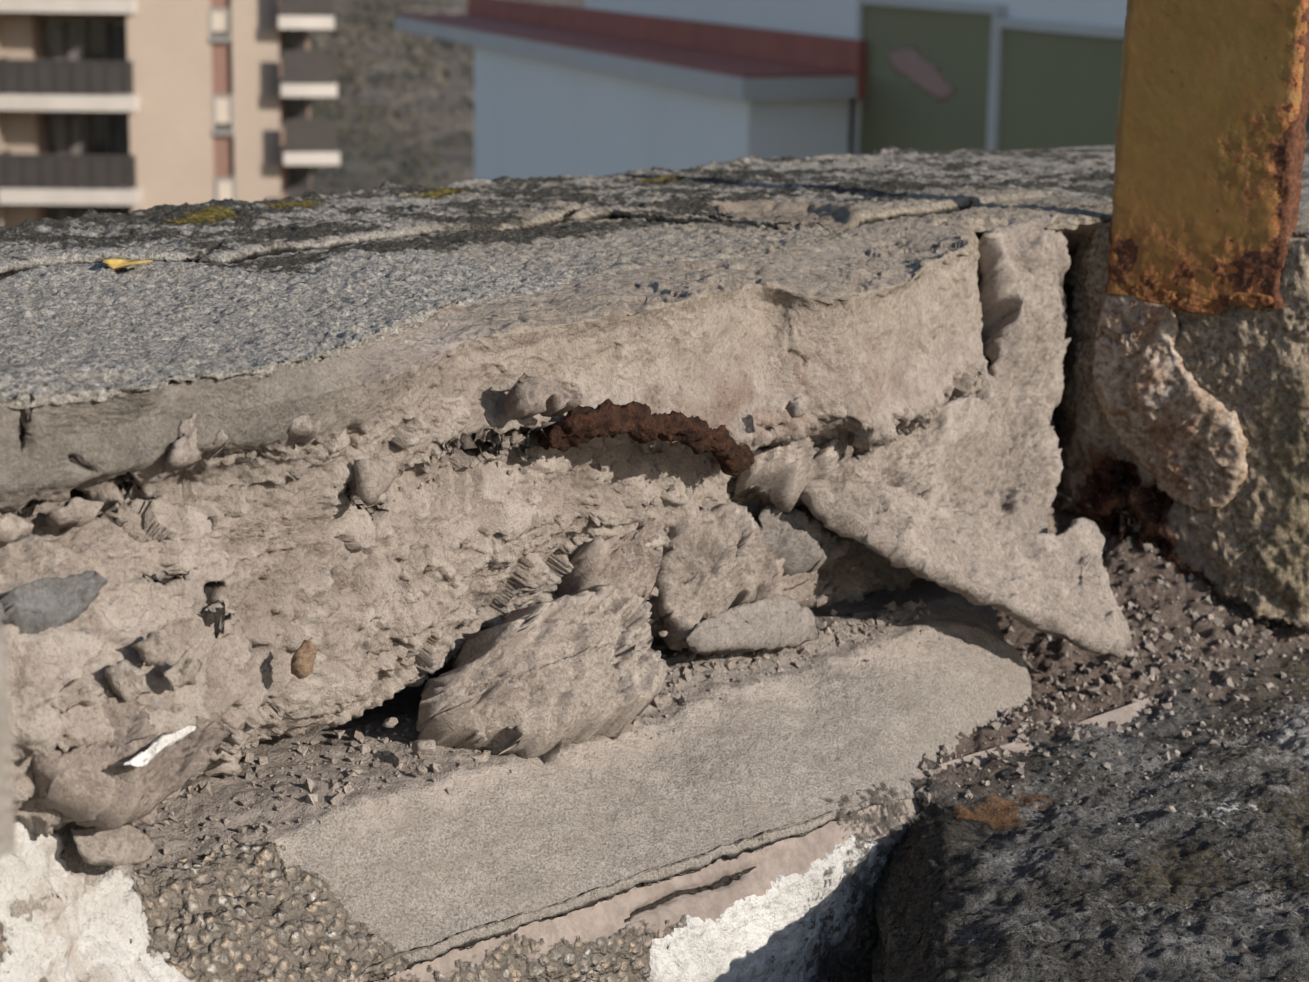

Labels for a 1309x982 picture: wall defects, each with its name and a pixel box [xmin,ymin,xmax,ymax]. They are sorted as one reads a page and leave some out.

crack [0,261,103,280]
crack [154,232,440,264]
crack [514,209,688,231]
crack [827,201,973,233]
corrosion [538,399,755,477]
corrosion [1076,445,1204,577]
spalling [0,198,1132,982]
corrosion [954,794,1049,829]
crack [368,819,839,982]
water stain [770,778,994,982]